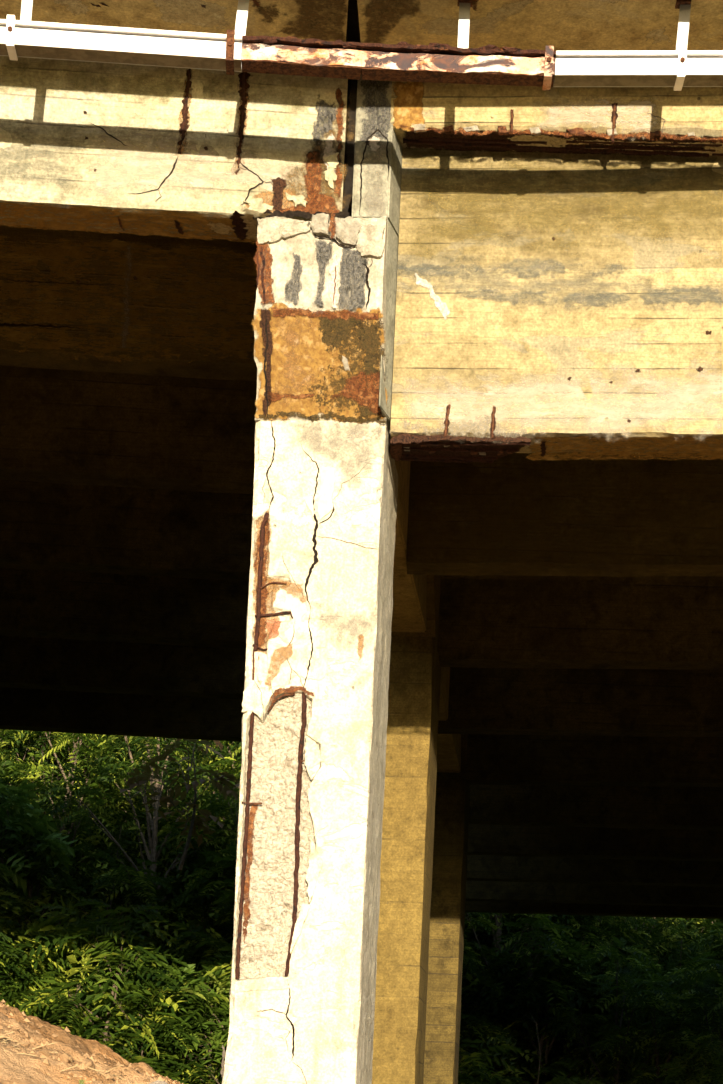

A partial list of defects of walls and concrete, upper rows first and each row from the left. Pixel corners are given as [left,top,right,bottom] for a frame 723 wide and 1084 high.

leakage [258,0,348,42]
leakage [363,0,419,43]
crack [127,157,178,200]
spalling [233,72,250,175]
spalling [207,129,389,259]
spalling [400,103,723,158]
rust [0,88,388,424]
leakage [284,253,302,303]
leakage [314,240,369,309]
crack [262,420,375,686]
spalling [234,511,328,992]
crack [257,988,307,1084]